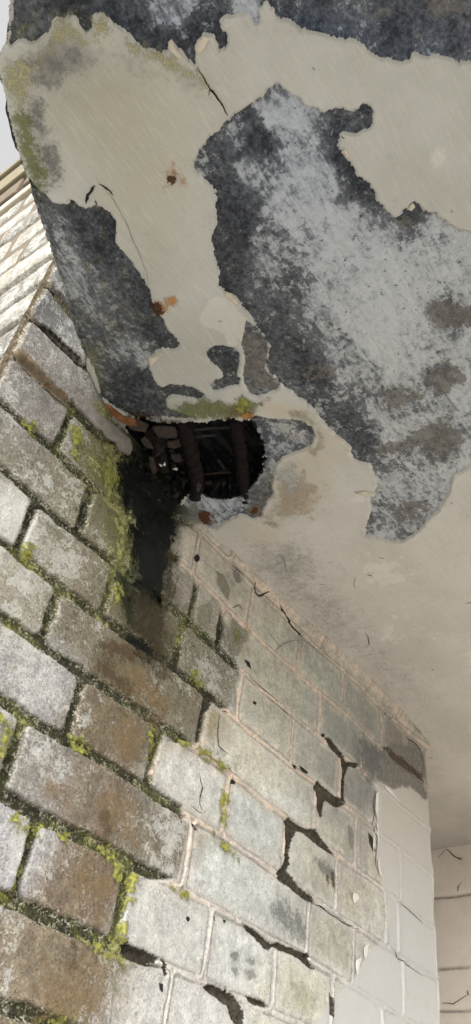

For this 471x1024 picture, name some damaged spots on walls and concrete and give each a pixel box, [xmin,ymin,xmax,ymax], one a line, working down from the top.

peeling [9,0,471,64]
crack [197,67,228,115]
crack [85,174,148,279]
rust [150,297,176,316]
peeling [12,83,471,541]
leakage [113,452,181,685]
crack [232,565,324,657]
peeling [356,733,425,877]
peeling [315,859,335,889]
peeling [356,943,370,975]